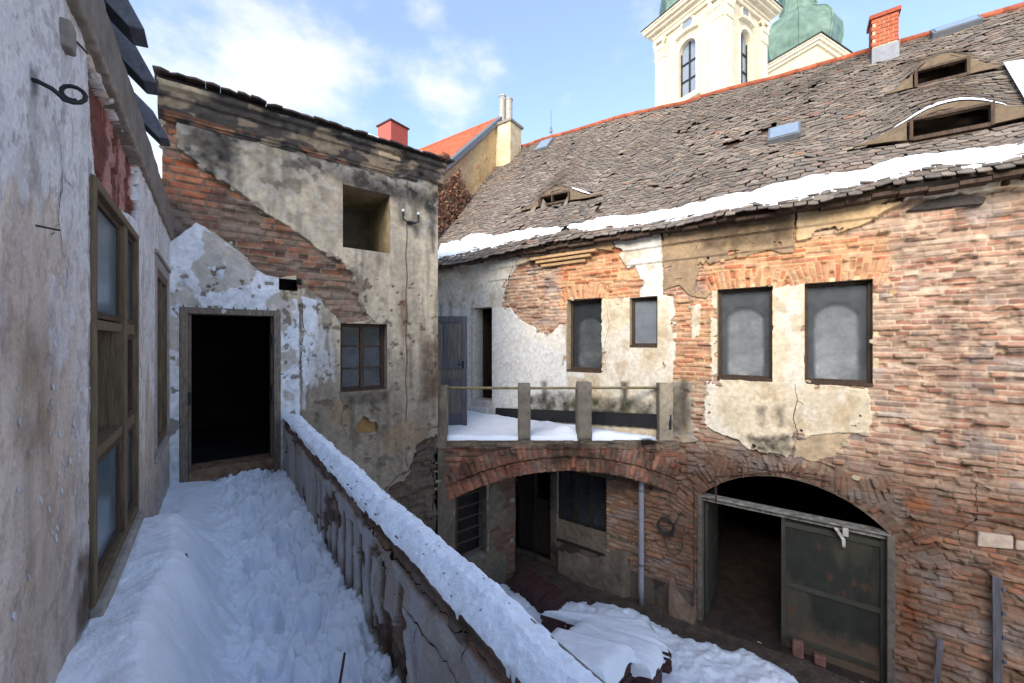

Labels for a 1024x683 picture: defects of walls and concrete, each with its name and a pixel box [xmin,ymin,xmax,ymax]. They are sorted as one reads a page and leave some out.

spalling [158,119,370,323]
spalling [502,243,644,336]
spalling [356,416,377,433]
spalling [606,180,1024,683]
crack [365,515,501,683]